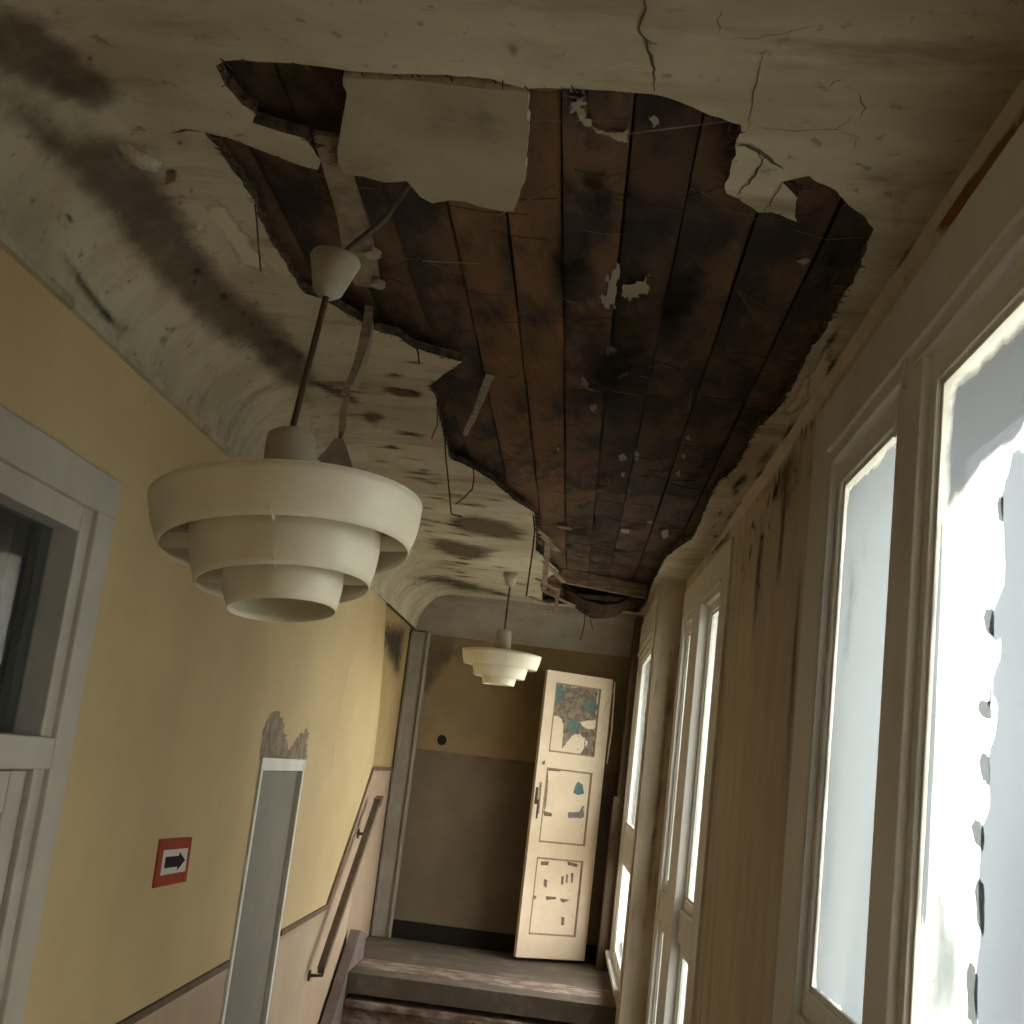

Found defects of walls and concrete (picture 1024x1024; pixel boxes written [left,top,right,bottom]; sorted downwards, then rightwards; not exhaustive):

leakage [0,16,110,105]
crack [637,0,659,92]
crack [716,11,866,211]
leakage [30,120,382,422]
spalling [210,58,872,619]
leakage [385,374,418,397]
leakage [414,494,525,595]
leakage [384,626,404,671]
spalling [260,711,310,760]
peeling [551,684,598,755]